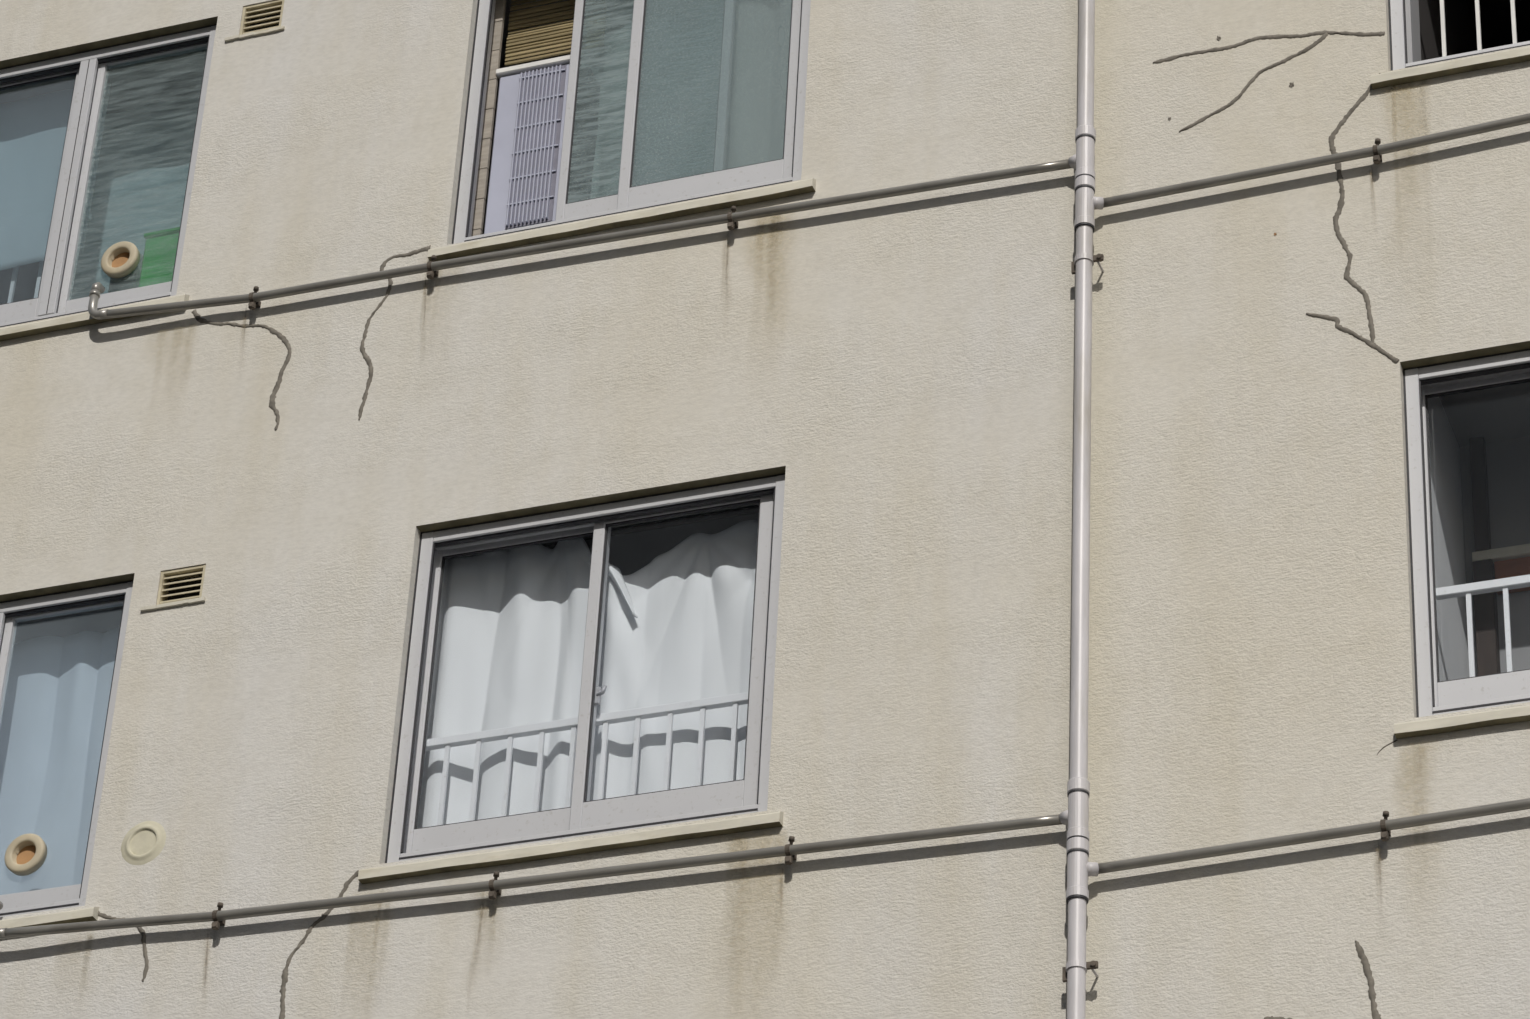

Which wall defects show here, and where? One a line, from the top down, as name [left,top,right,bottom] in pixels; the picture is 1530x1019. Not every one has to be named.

crack [1153,30,1385,133]
crack [1306,73,1399,364]
crack [191,309,292,430]
crack [358,245,431,420]
crack [279,870,359,1019]
crack [1264,1011,1292,1019]
crack [1355,940,1381,1019]